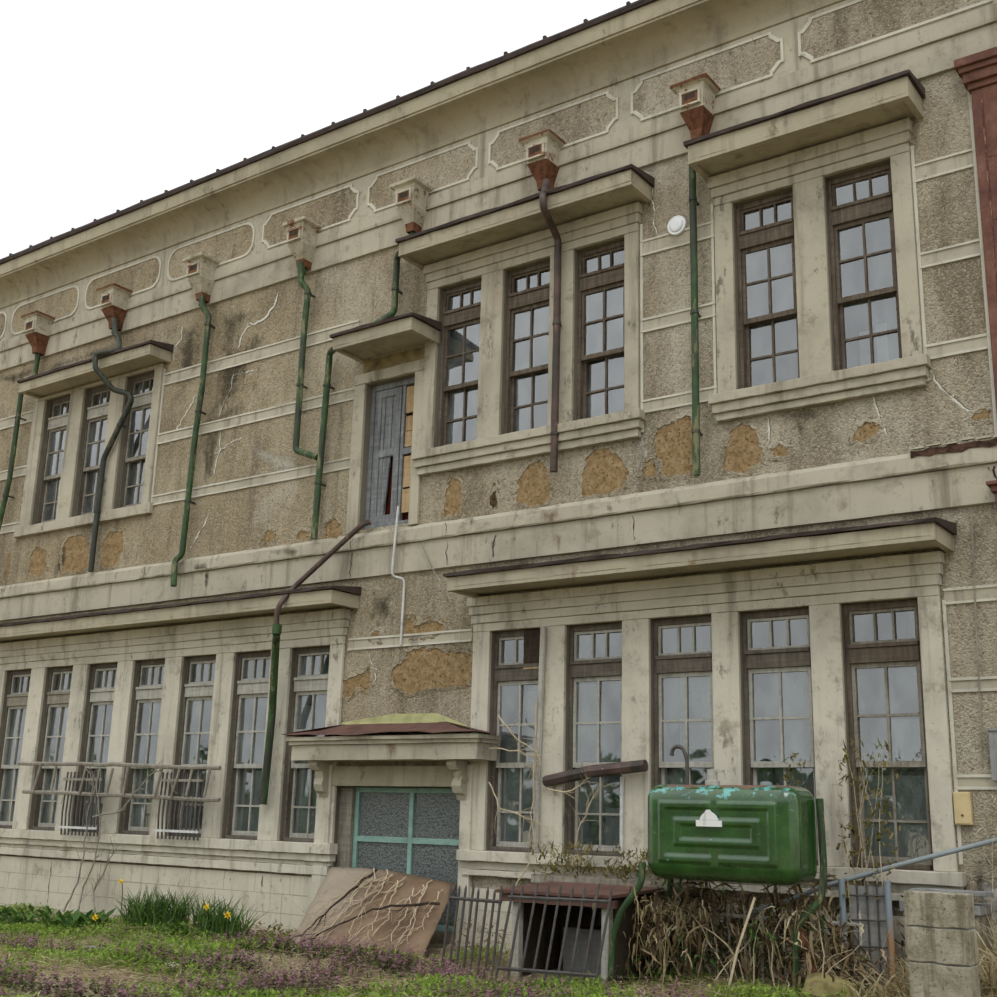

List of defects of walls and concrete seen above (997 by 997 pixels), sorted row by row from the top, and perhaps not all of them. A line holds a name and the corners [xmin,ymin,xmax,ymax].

crack [238,294,279,348]
crack [177,394,196,429]
crack [214,368,261,474]
flaking render [440,472,468,522]
flaking render [482,455,557,515]
flaking render [576,409,702,501]
flaking render [718,418,796,478]
flaking render [848,417,887,449]
flaking render [26,526,127,581]
flaking render [342,614,473,705]